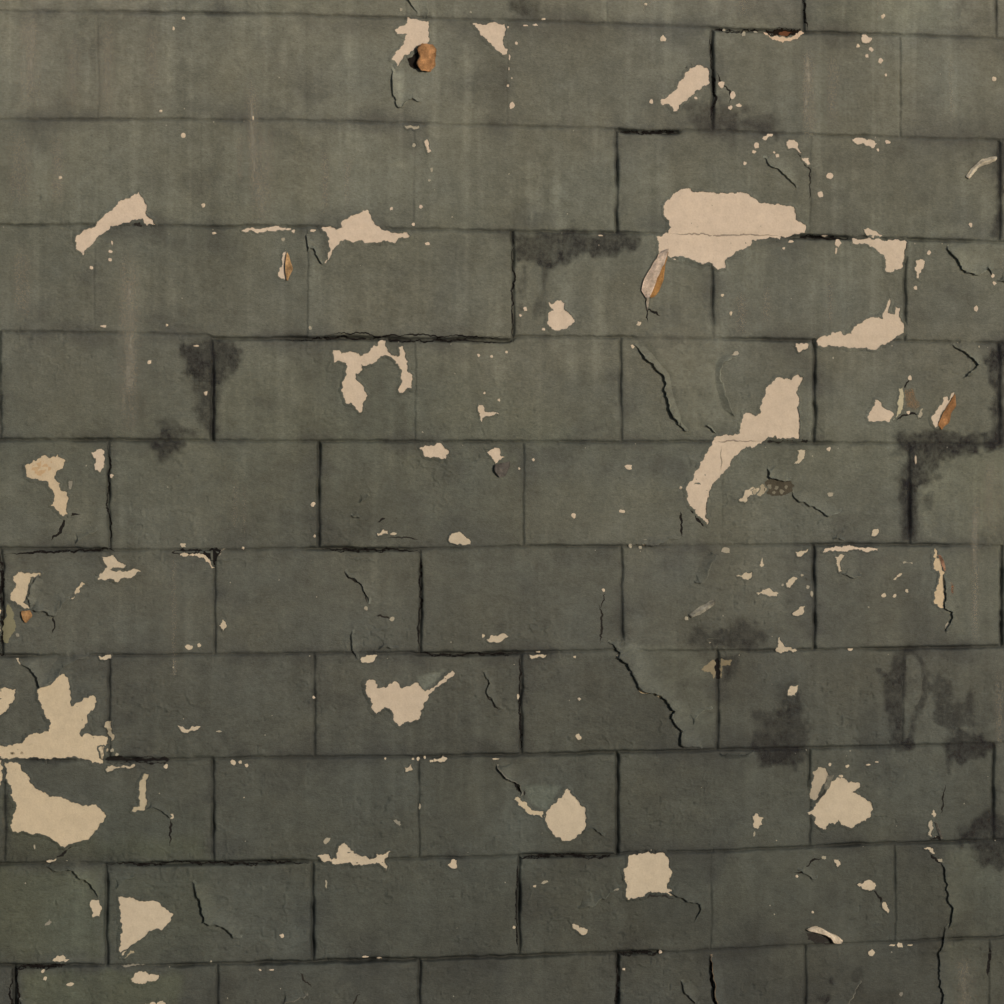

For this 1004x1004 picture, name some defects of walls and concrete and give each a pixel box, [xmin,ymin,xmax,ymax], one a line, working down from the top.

peeling [72,190,158,269]
leakage [517,230,635,267]
peeling [641,185,810,322]
peeling [822,226,931,290]
peeling [793,291,908,354]
peeling [329,337,416,415]
peeling [628,370,842,549]
peeling [351,629,459,730]
peeling [0,670,174,863]
peeling [803,763,876,833]
peeling [577,846,705,922]
peeling [116,893,177,1004]